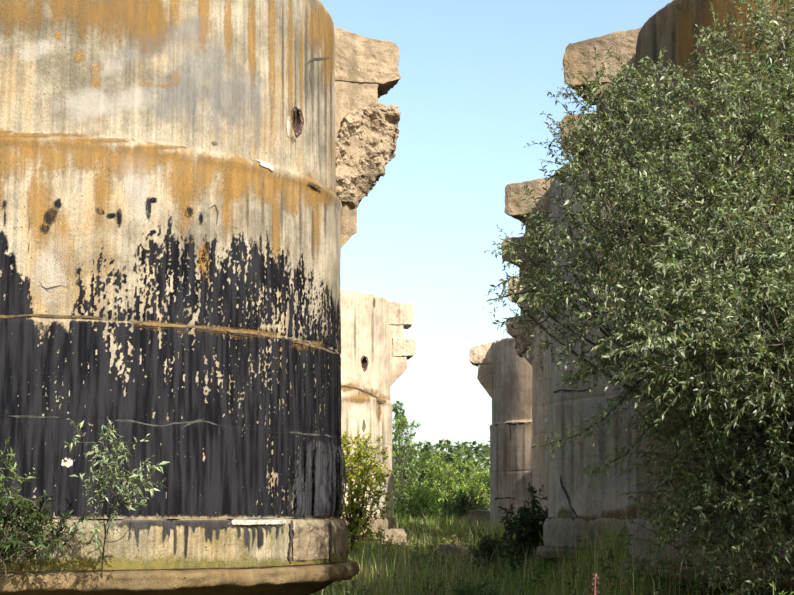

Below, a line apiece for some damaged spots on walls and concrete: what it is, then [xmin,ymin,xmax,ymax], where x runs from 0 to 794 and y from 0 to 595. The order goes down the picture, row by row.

rust [289,0,333,110]
rust [0,129,334,259]
rust [199,245,210,279]
spalling [229,519,329,561]